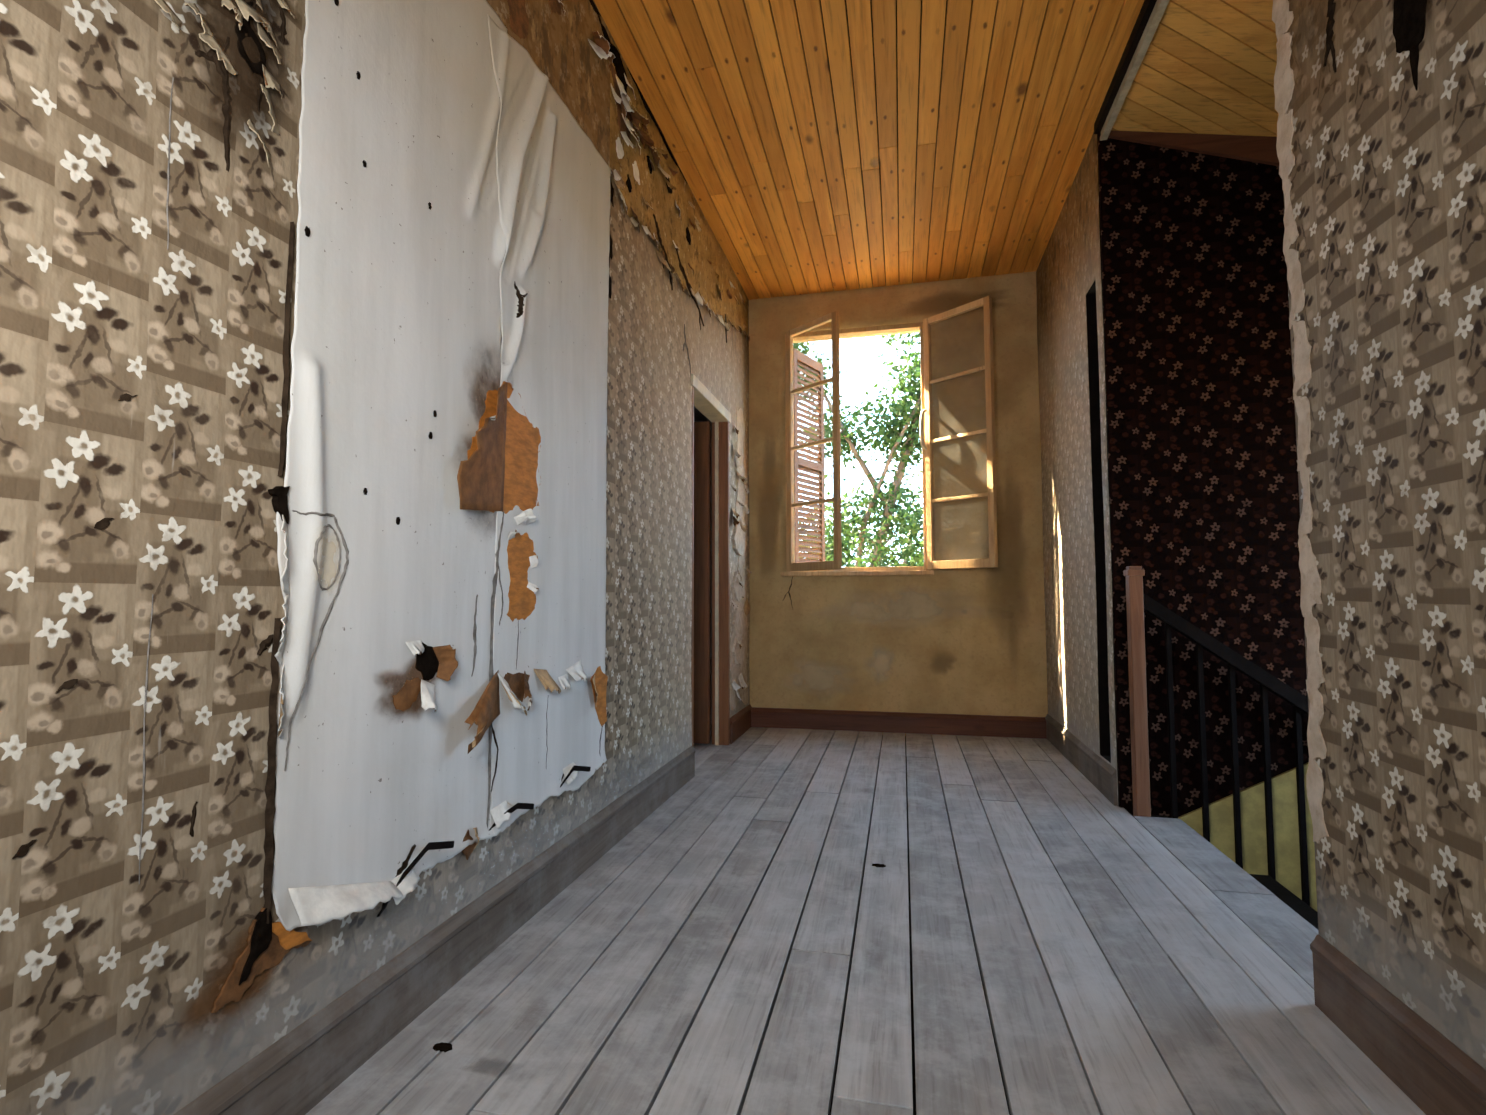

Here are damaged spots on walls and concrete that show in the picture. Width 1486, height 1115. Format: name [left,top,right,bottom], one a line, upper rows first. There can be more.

spalling [155,0,295,167]
peeling [507,0,529,39]
spalling [1392,0,1431,91]
flaking render [588,0,750,341]
spalling [416,642,439,680]